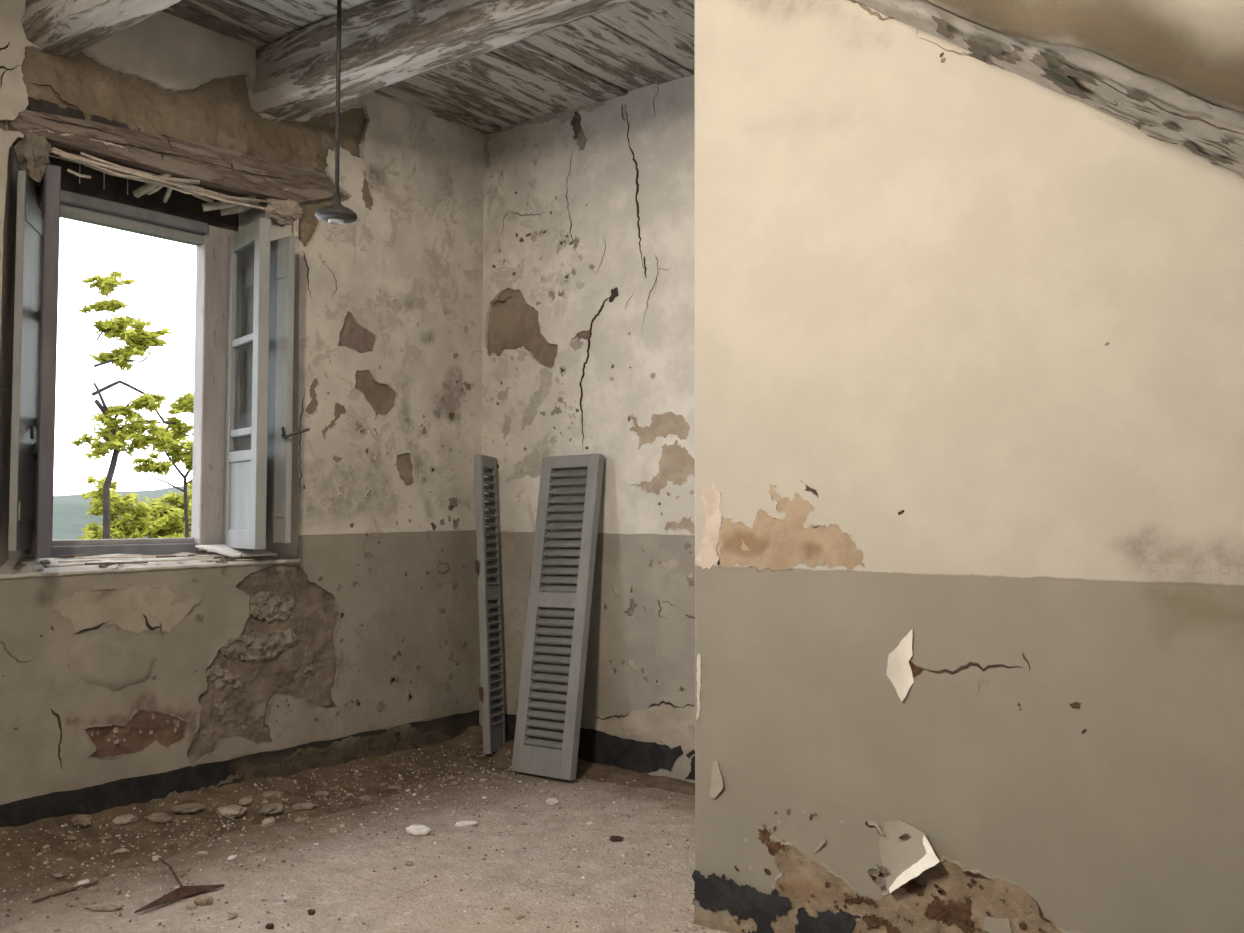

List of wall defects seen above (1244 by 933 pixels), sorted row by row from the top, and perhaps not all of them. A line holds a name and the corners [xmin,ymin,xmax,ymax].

crack [0,42,20,89]
flaking render [0,47,375,252]
peeling [931,16,1098,100]
peeling [304,287,475,531]
flaking render [416,196,595,483]
crack [501,84,670,452]
peeling [628,410,865,588]
crack [51,709,63,770]
flaking render [83,523,421,766]
peeling [591,653,701,751]
crack [886,629,1030,702]
peeling [692,809,1082,933]